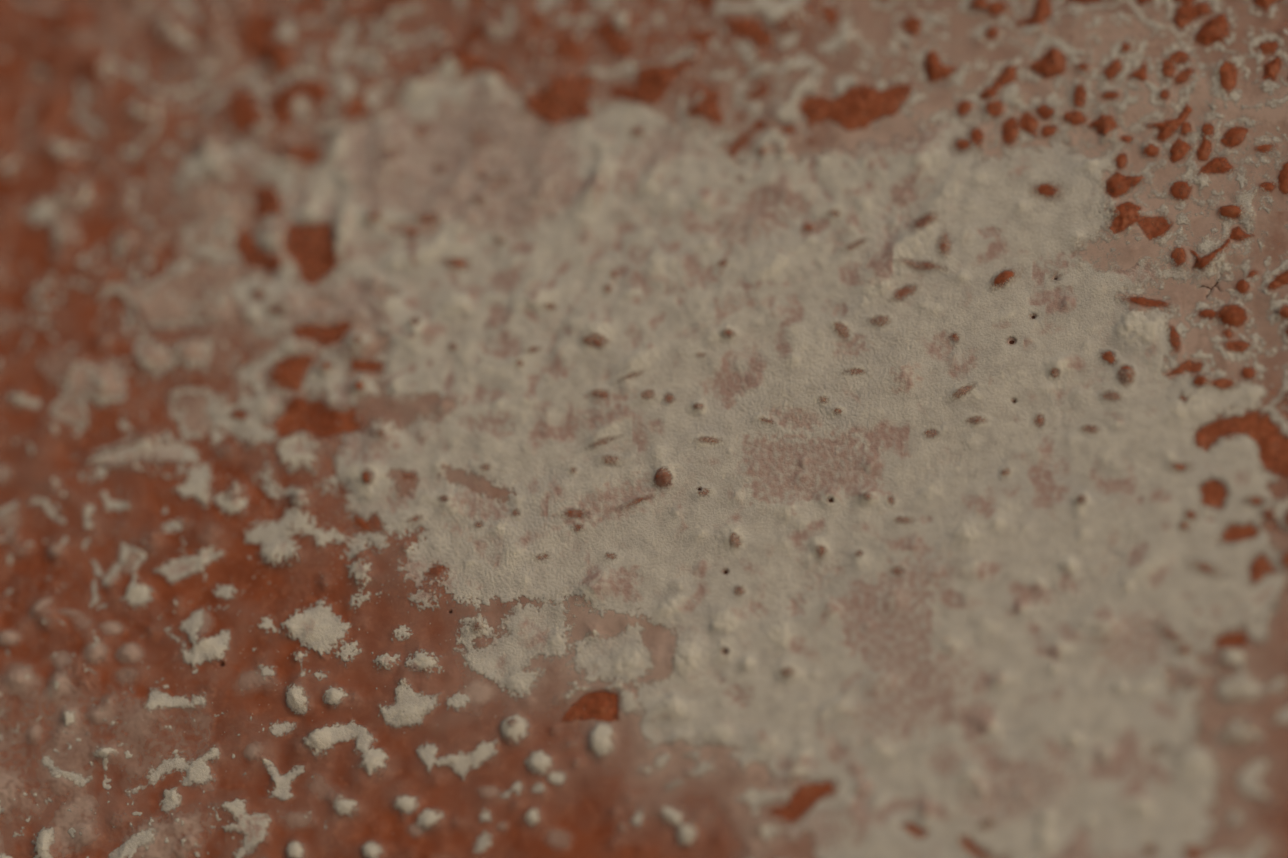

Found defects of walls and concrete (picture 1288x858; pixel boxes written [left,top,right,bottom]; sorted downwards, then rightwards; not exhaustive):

peeling [1108,208,1171,240]
peeling [284,222,338,285]
peeling [292,321,351,348]
peeling [273,396,359,439]
peeling [1195,411,1288,476]
peeling [1200,480,1228,509]
peeling [1223,524,1259,542]
peeling [770,781,833,821]